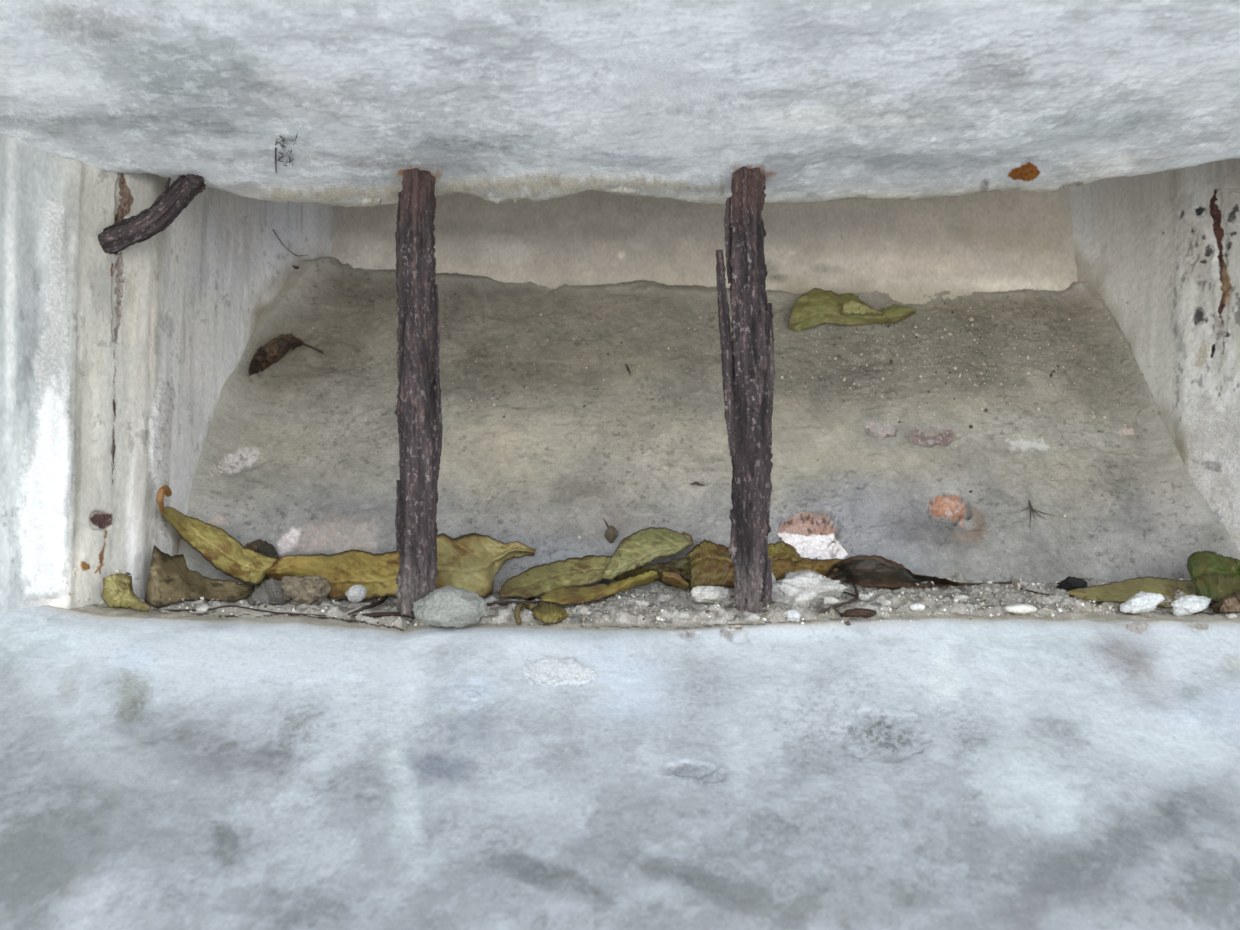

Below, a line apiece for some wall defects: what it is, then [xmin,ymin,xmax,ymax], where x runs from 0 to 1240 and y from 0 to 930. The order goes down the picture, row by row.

corrosion [388,162,448,188]
corrosion [721,158,782,185]
corrosion [990,154,1058,189]
crack [110,173,134,491]
spalling [926,493,966,529]
spalling [772,510,850,560]